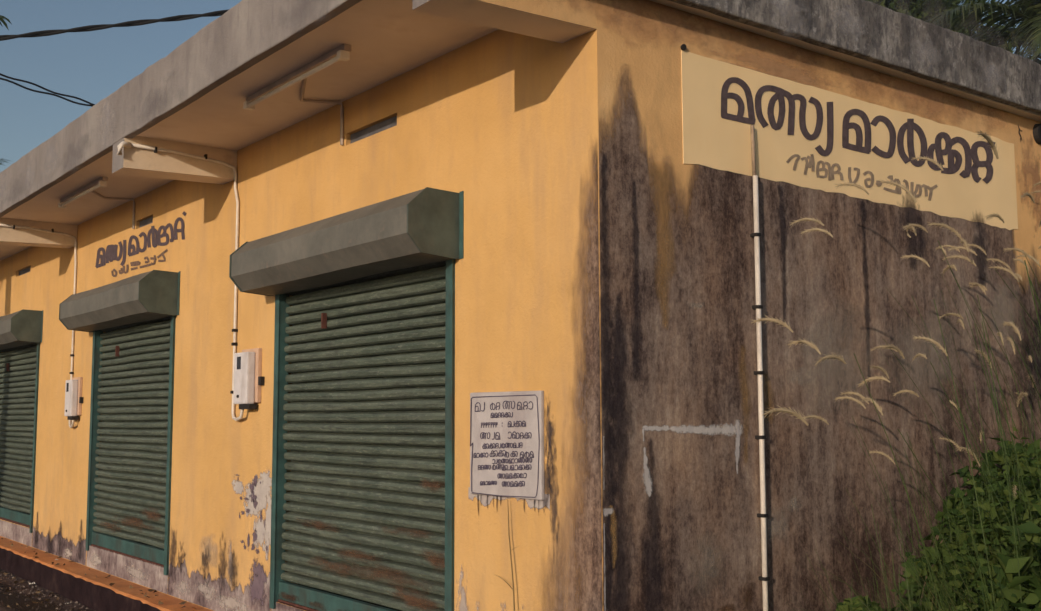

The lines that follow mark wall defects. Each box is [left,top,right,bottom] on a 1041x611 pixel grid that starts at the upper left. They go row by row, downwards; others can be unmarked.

leakage [610,0,996,116]
leakage [544,78,1041,611]
spalling [0,471,304,611]
spalling [458,571,478,611]